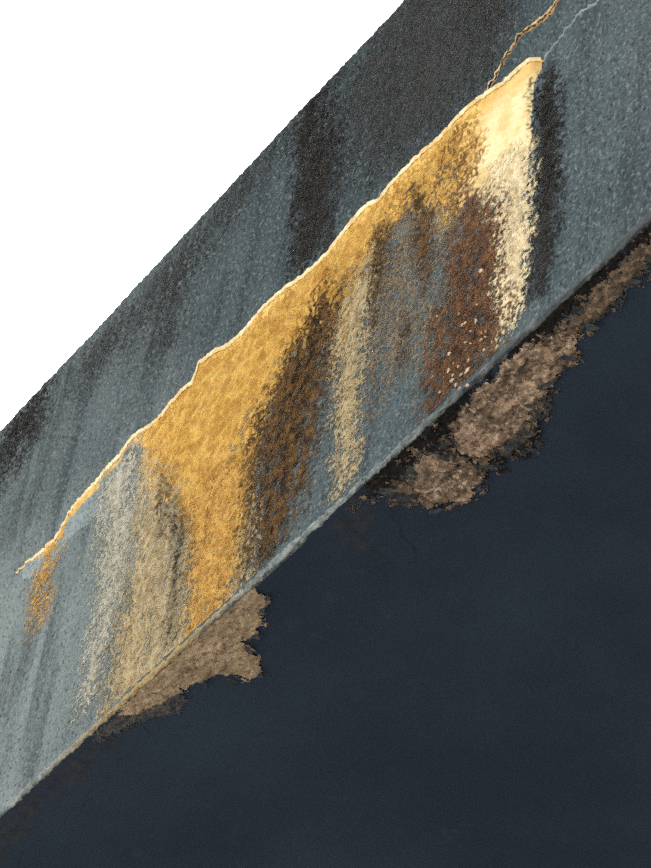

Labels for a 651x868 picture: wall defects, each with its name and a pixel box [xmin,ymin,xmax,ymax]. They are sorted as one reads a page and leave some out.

crack [474,0,599,100]
corrosion [95,102,516,720]
peeling [346,232,651,515]
peeling [91,587,271,743]